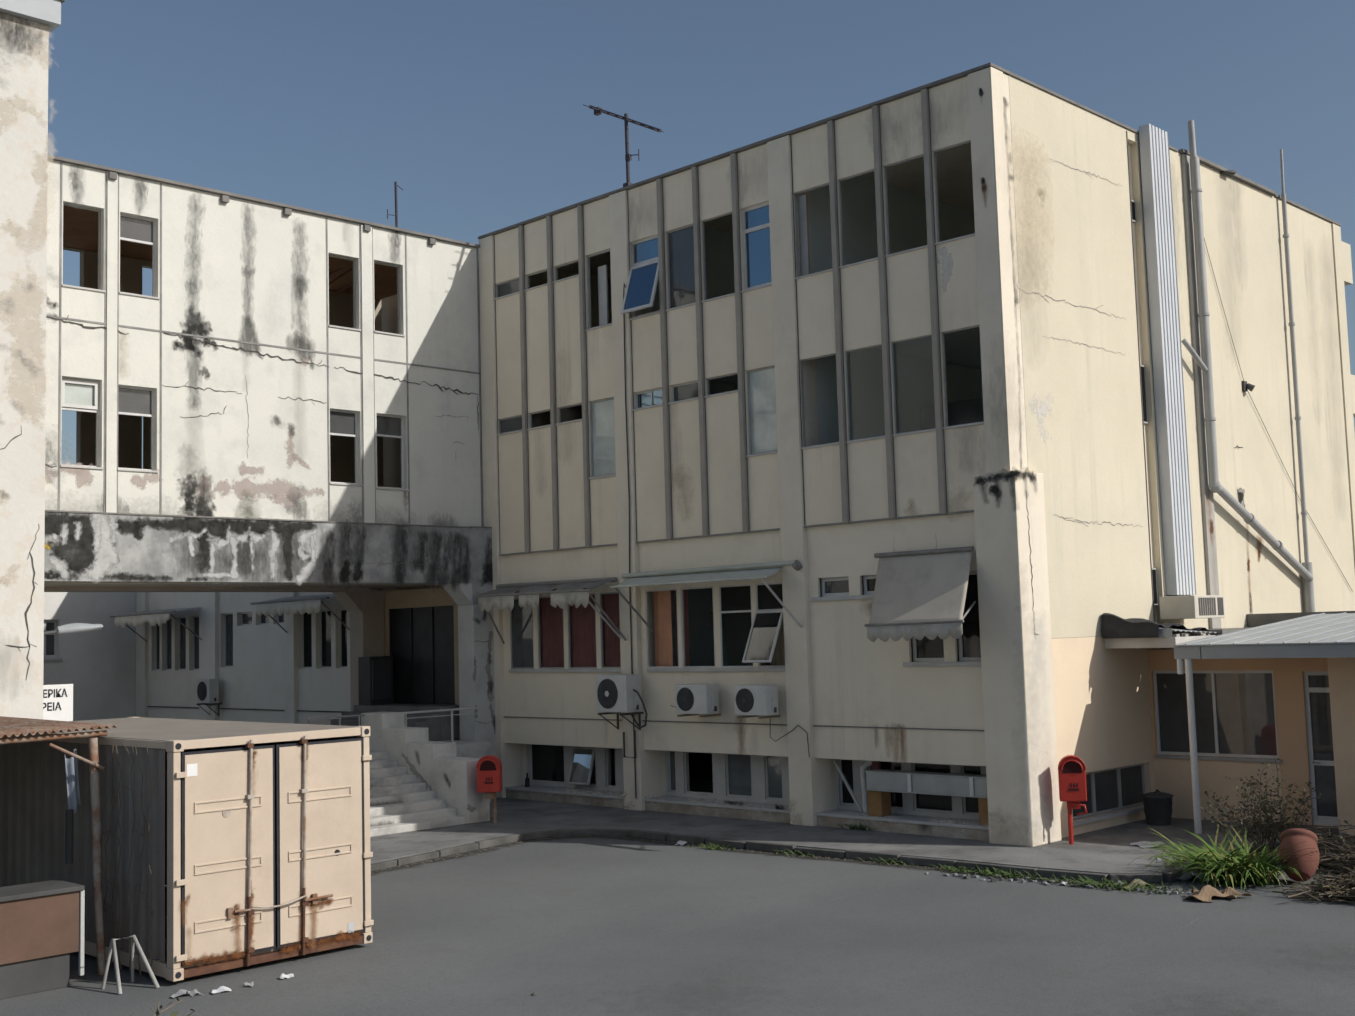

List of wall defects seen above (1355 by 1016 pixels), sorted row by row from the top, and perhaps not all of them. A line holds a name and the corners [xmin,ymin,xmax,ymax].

crack [46,315,129,334]
leakage [174,236,218,406]
leakage [240,271,259,353]
leakage [294,279,311,357]
crack [1016,289,1121,319]
crack [163,333,479,456]
peeling [199,418,324,508]
leakage [975,468,1036,498]
leakage [44,474,364,584]
leakage [393,524,493,587]
crack [6,524,40,679]
rust [281,931,361,953]